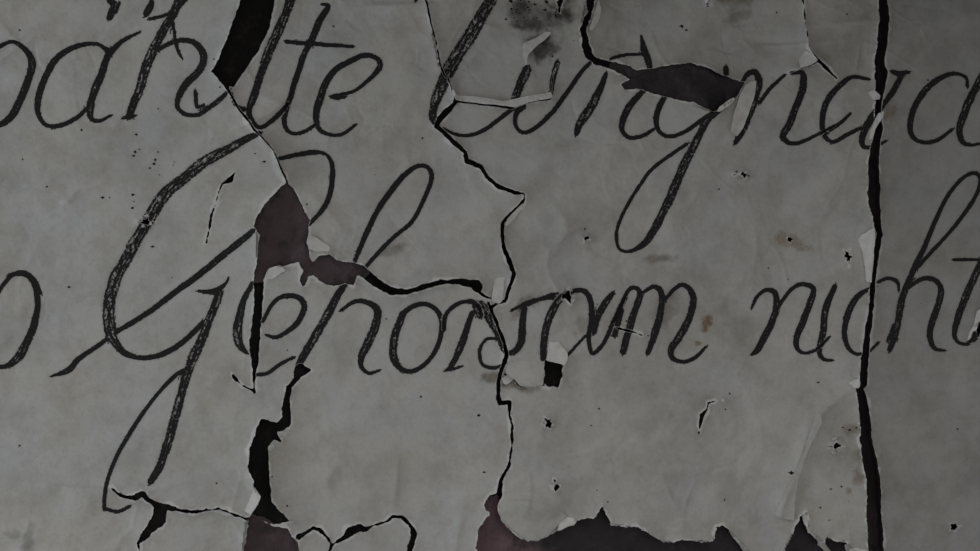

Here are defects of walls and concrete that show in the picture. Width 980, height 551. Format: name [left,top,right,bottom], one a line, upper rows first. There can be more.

crack [580,0,612,69]
peeling [609,62,744,111]
peeling [253,179,370,287]
crack [364,0,564,503]
crack [856,0,884,551]
crack [615,327,642,336]
peeling [139,510,411,551]
peeling [475,495,743,551]
peeling [785,516,846,551]